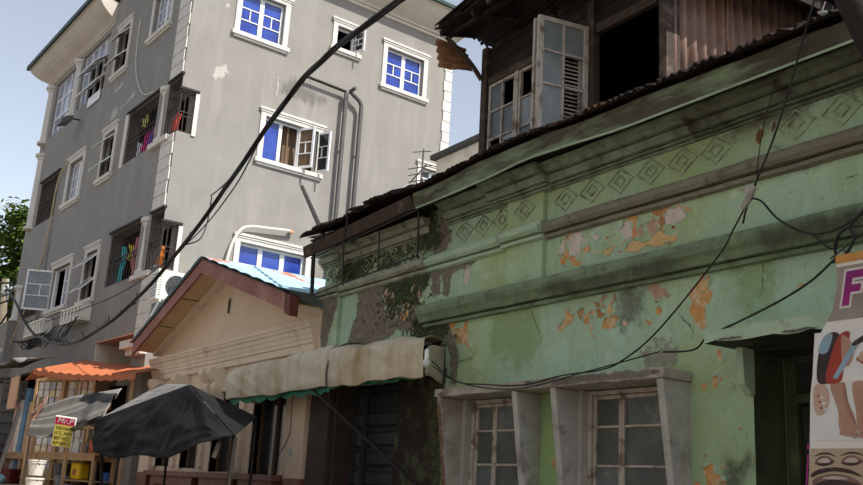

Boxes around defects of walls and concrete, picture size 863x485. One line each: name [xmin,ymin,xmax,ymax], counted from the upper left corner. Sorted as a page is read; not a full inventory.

peeling [558,202,692,269]
spalling [320,297,341,347]
spalling [348,261,475,345]
peeling [557,287,628,338]
peeling [689,274,713,329]
peeling [694,450,731,485]